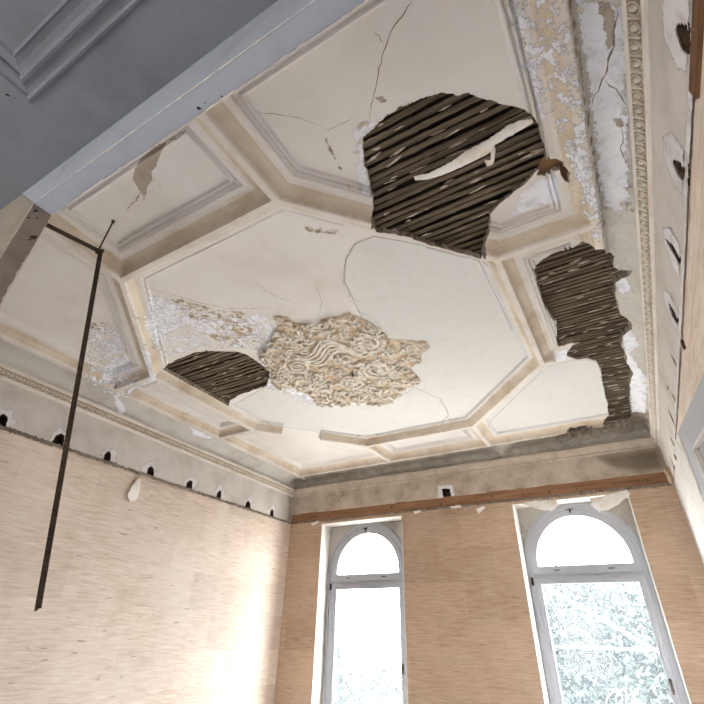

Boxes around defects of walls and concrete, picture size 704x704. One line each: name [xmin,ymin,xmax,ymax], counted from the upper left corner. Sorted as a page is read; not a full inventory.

crack [369,1,412,118]
crack [592,9,626,105]
spalling [662,0,691,72]
peeling [0,0,370,306]
spalling [663,132,690,193]
flaking render [352,0,648,442]
crack [340,236,390,336]
flaking render [82,293,314,414]
spalling [0,407,19,427]
spalling [49,426,74,446]
spalling [102,447,119,462]
spalling [140,462,157,476]